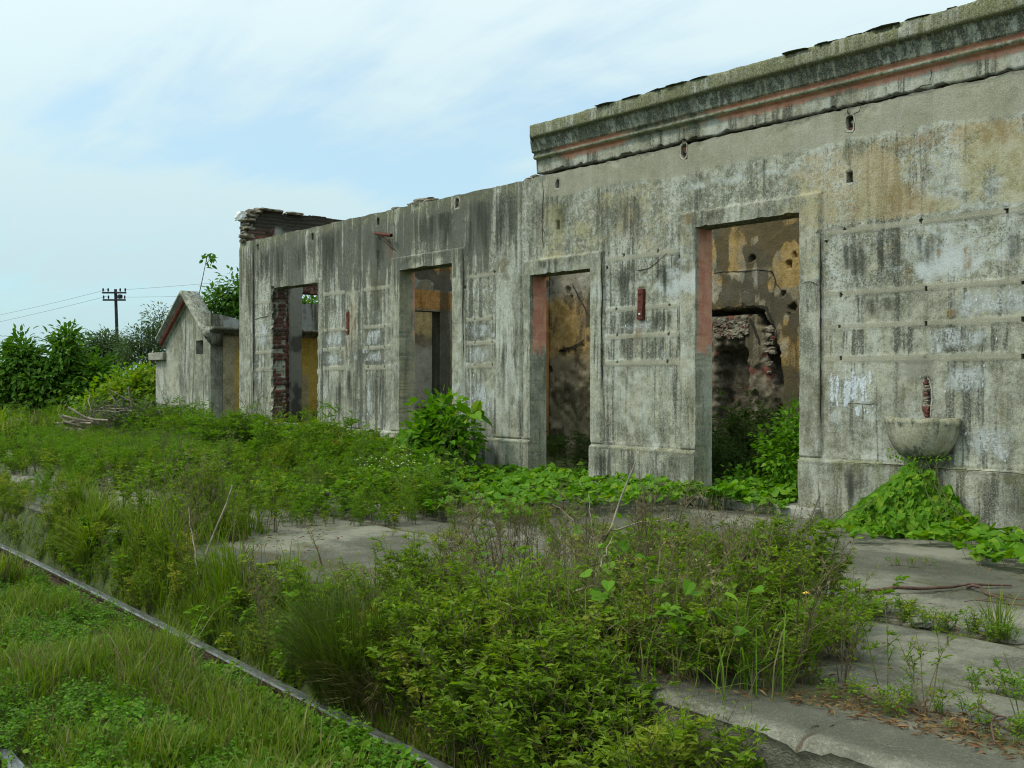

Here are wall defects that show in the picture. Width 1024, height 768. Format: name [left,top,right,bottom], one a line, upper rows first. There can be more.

spalling [238,207,304,243]
spalling [713,315,750,340]
spalling [764,325,777,375]
spalling [919,365,985,419]